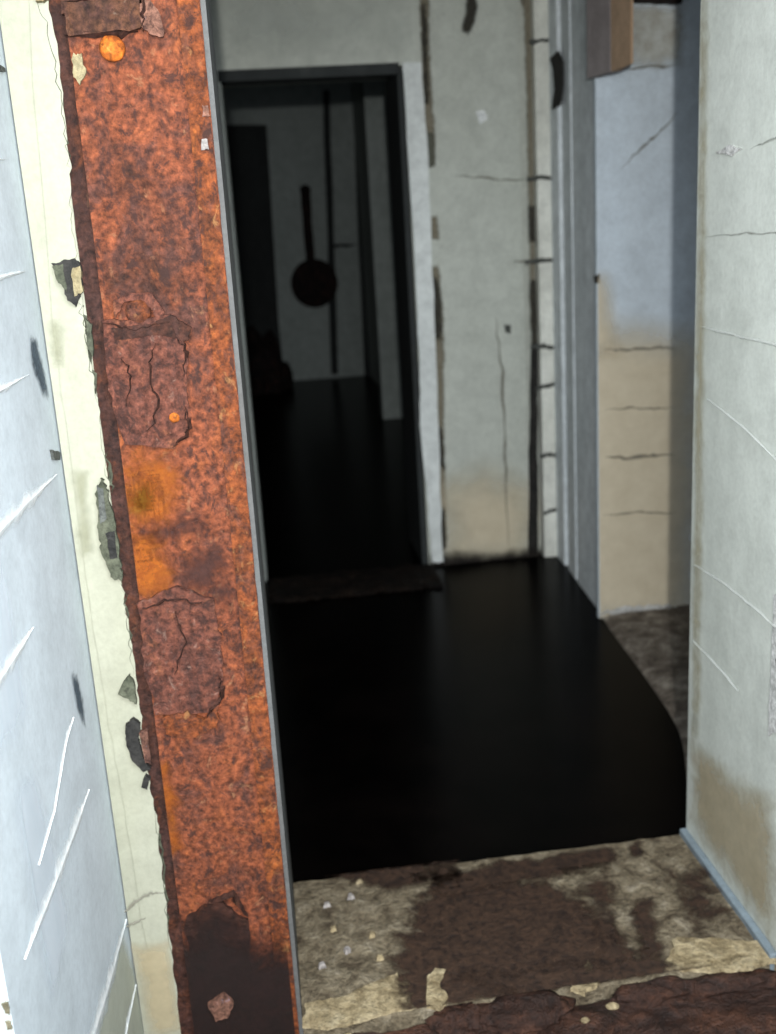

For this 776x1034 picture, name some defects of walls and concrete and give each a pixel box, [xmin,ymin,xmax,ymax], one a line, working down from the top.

rust [140,0,165,38]
rust [71,53,87,85]
rust [111,292,192,341]
crack [495,315,538,552]
peeling [29,0,180,1033]
rust [125,463,194,593]
rust [161,766,178,853]
rust [207,992,234,1022]